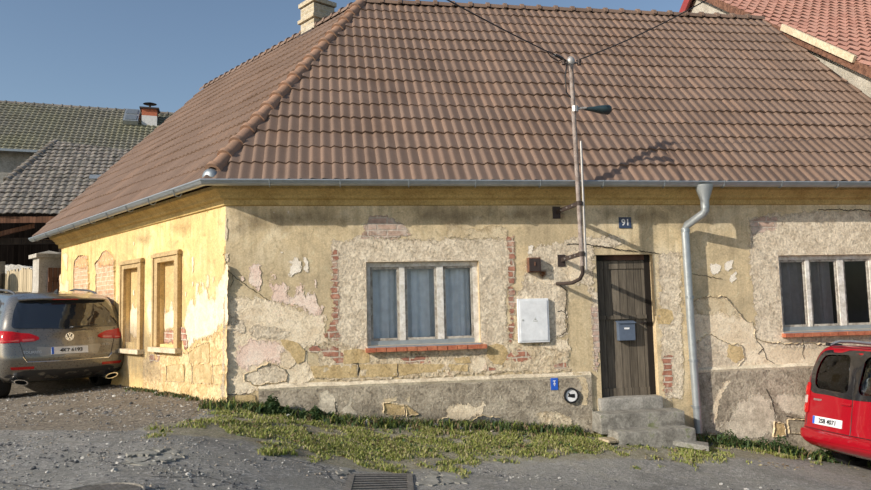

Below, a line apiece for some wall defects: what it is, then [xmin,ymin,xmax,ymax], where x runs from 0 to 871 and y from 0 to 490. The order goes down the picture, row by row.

flaking render [361,215,411,240]
flaking render [749,216,778,236]
flaking render [59,249,118,308]
peeling [130,290,151,338]
flaking render [143,224,589,417]
flaking render [591,306,600,370]